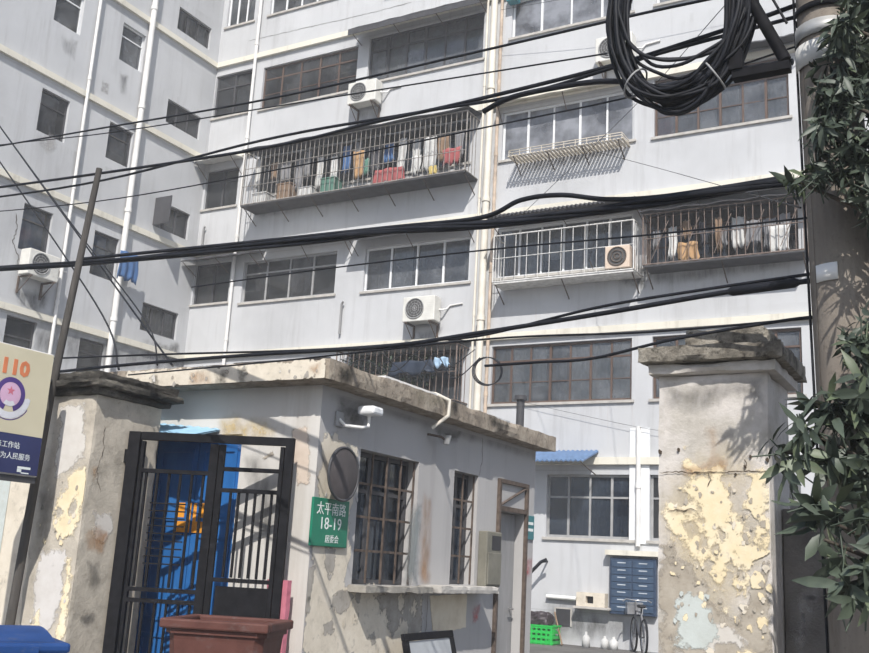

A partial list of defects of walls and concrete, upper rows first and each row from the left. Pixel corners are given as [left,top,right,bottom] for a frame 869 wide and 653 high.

peeling [41,466,86,546]
flaking render [292,427,359,500]
crack [663,459,766,487]
peeling [55,557,73,640]
flaking render [303,492,424,653]
peeling [658,448,773,653]